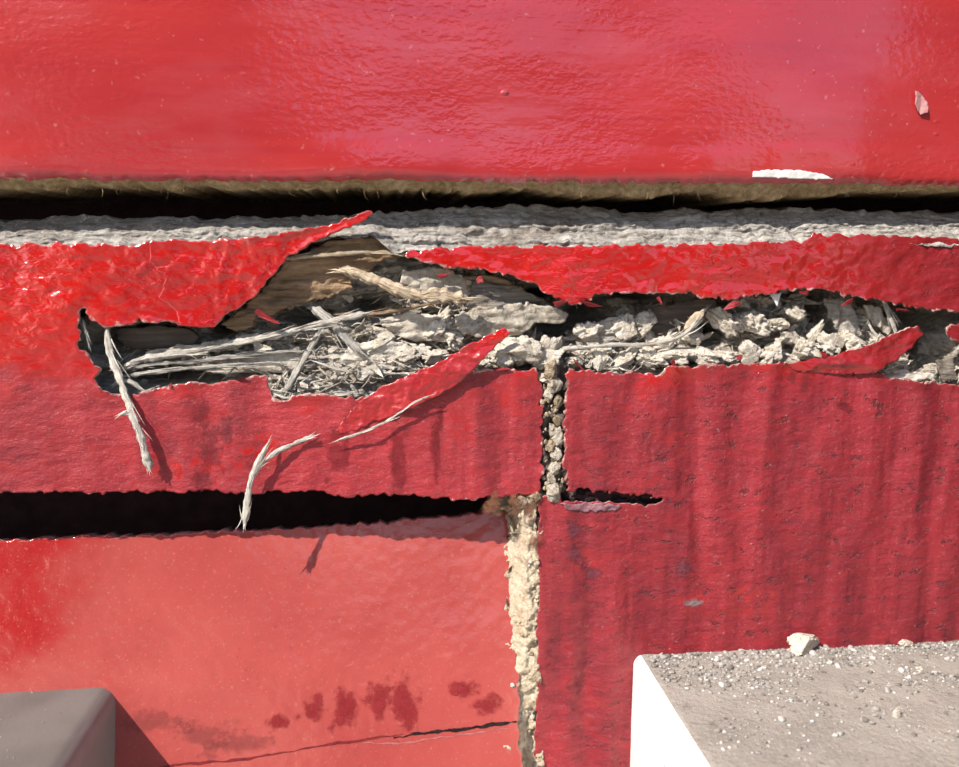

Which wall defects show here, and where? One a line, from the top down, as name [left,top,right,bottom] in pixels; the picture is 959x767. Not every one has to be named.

peeling [114,210,408,382]
peeling [329,266,743,444]
peeling [770,289,959,382]
crack [537,358,663,513]
crack [163,721,517,767]